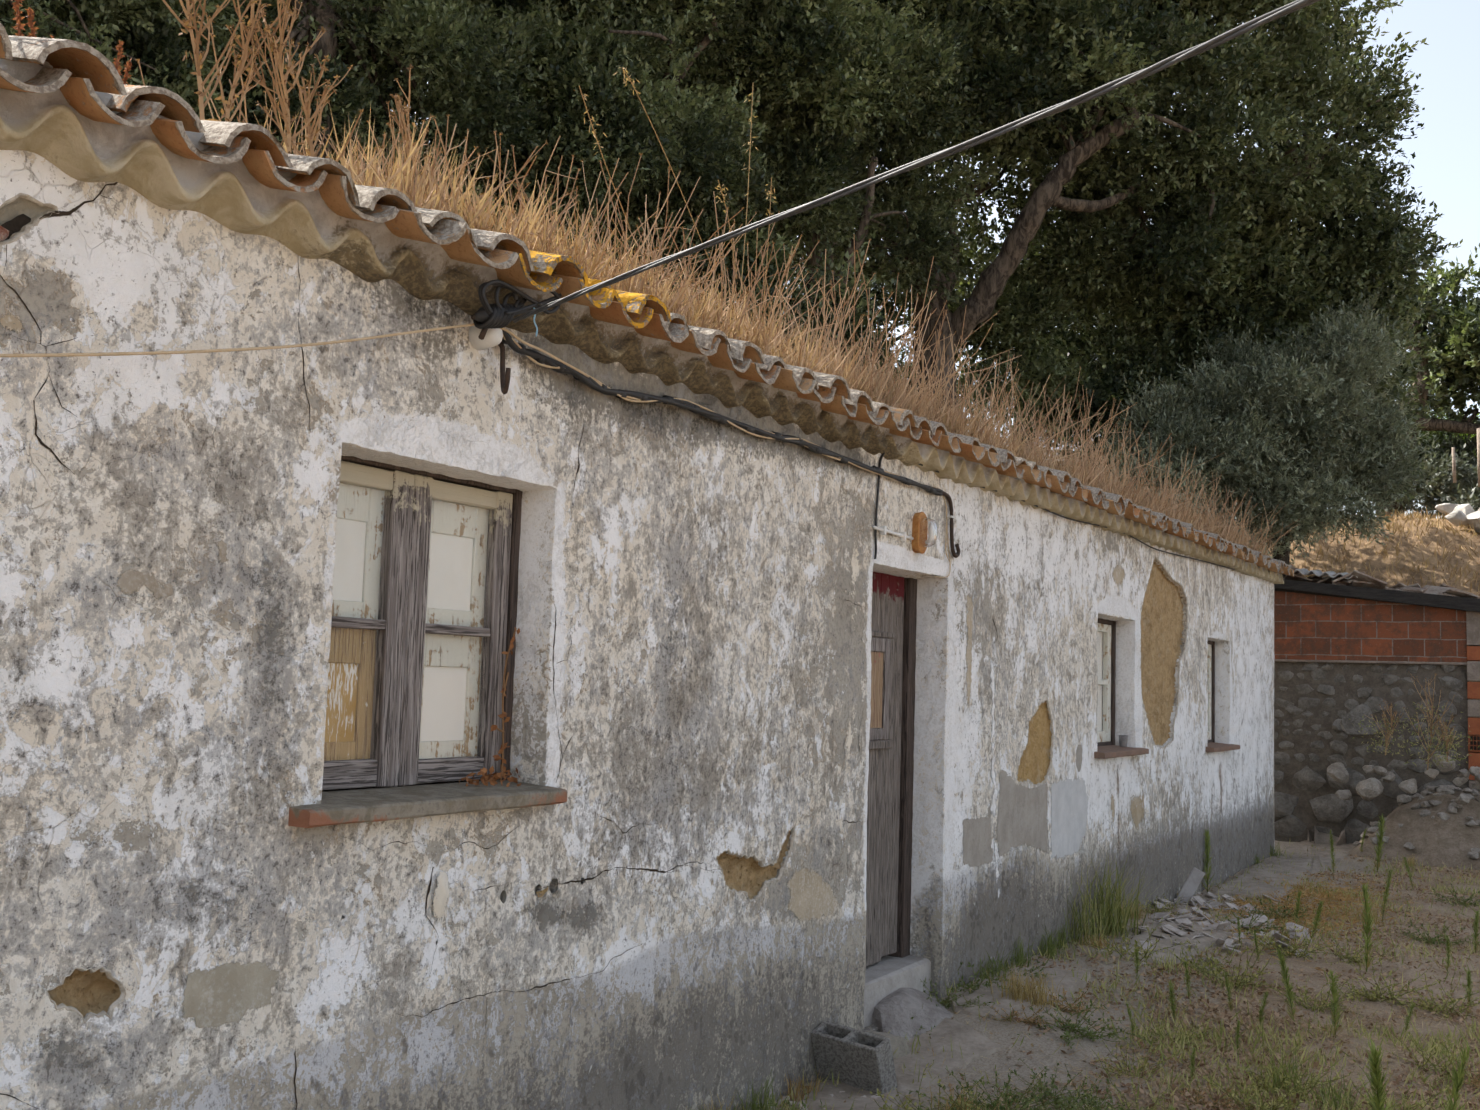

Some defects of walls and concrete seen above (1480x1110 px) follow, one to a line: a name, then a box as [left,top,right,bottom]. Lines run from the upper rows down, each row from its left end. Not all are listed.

spalling [0,193,59,252]
crack [39,182,118,219]
crack [0,245,78,475]
spalling [1140,556,1188,749]
spalling [1017,698,1054,788]
crack [345,817,714,1032]
leakage [524,893,606,933]
spalling [715,823,838,922]
spalling [46,966,126,1023]